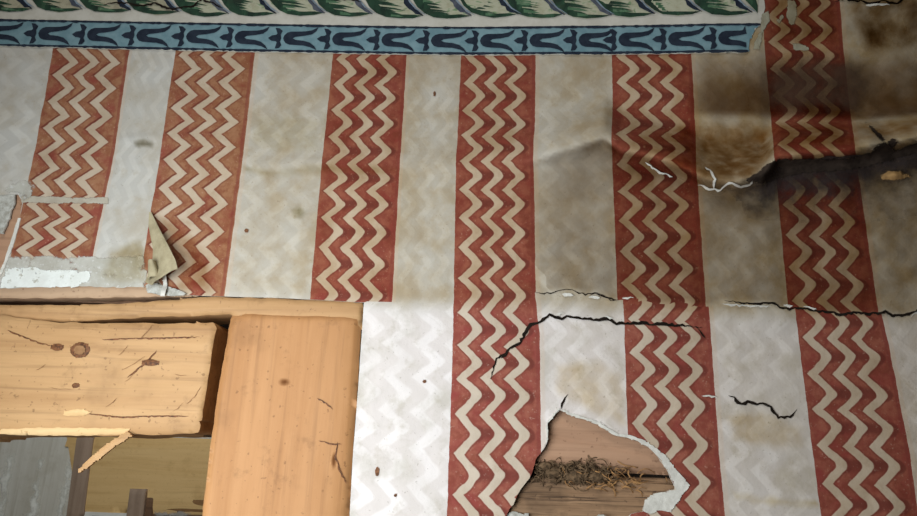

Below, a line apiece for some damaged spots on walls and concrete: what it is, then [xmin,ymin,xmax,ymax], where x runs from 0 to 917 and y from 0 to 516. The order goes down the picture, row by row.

crack [834,0,902,8]
damp [707,65,917,116]
damp [751,145,917,204]
peeling [0,181,32,234]
peeling [0,256,147,289]
crack [490,289,705,379]
crack [724,300,917,317]
crack [703,395,797,419]